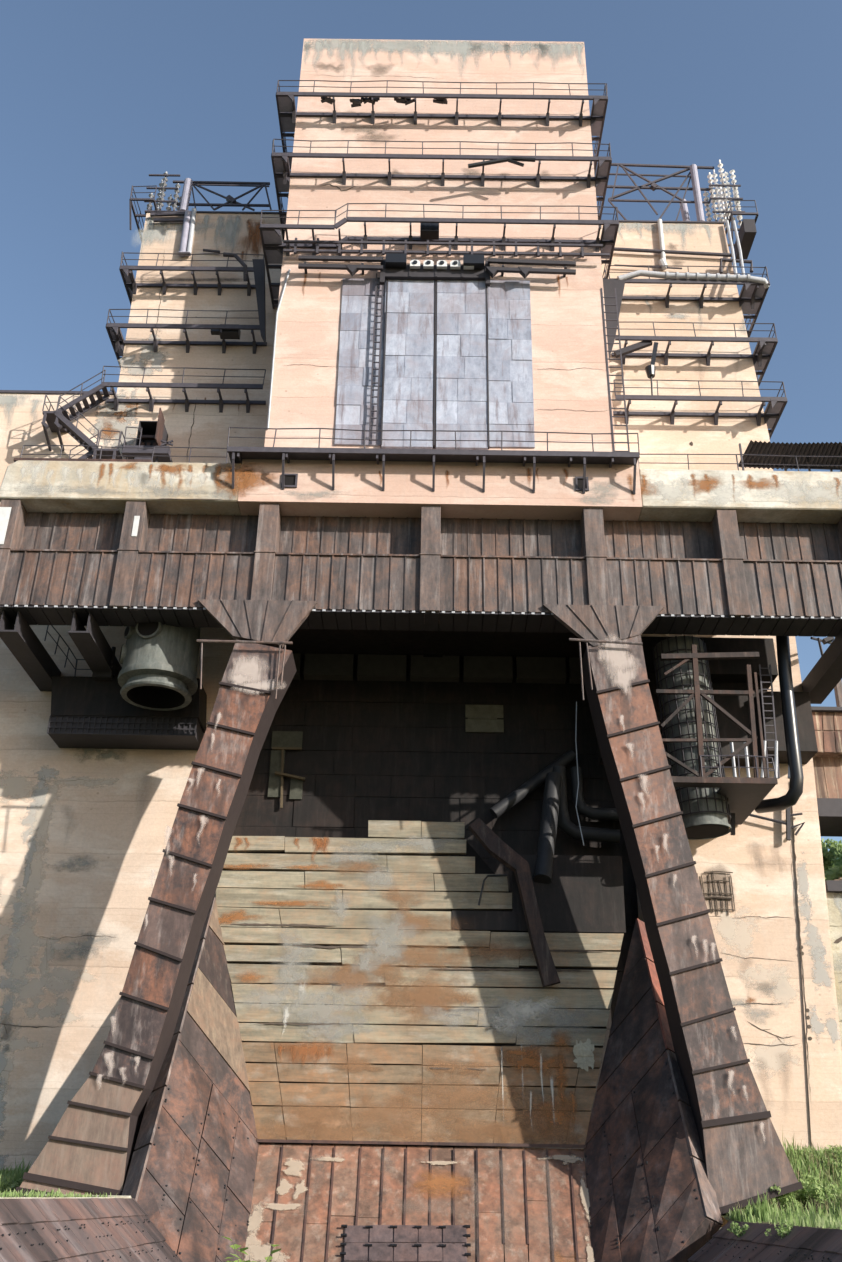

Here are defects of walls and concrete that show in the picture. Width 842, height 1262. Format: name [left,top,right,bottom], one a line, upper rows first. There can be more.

water stain [305,39,582,70]
rust [99,463,274,492]
rust [629,475,656,494]
rust [691,475,777,494]
rust [218,837,372,924]
crack [710,816,811,1096]
rust [310,943,526,1016]
crack [0,1023,62,1033]
rust [271,1124,367,1141]